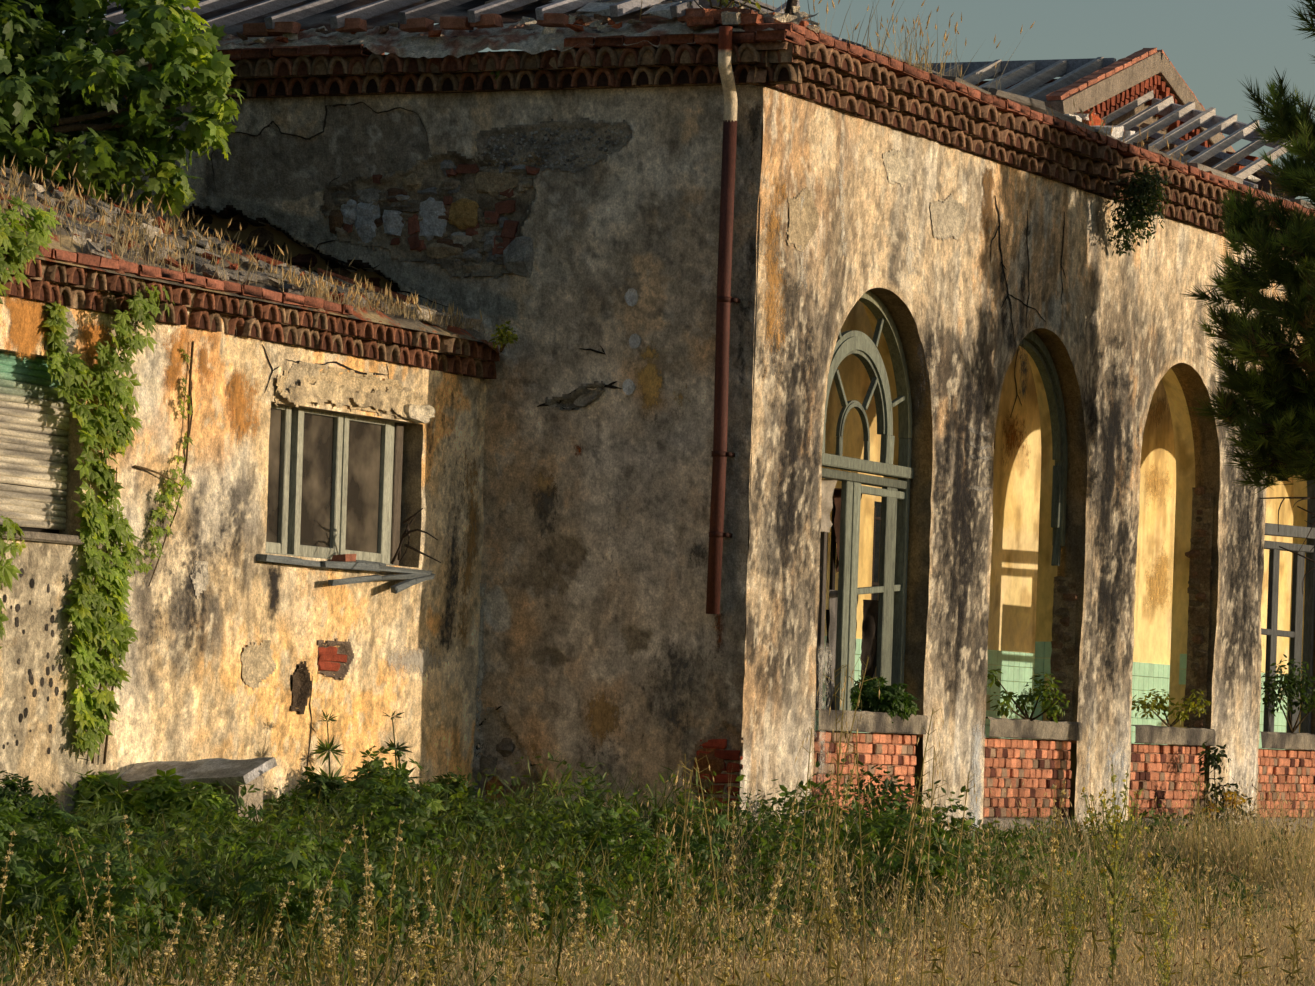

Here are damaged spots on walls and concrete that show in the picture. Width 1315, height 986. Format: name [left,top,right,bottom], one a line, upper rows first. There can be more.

spalling [182,96,632,292]
damp [745,105,761,210]
crack [990,196,1066,417]
damp [737,178,821,640]
damp [151,511,247,651]
flaking render [241,640,276,691]
damp [268,563,281,615]
spalling [291,638,354,714]
damp [917,331,992,704]
damp [1084,331,1170,702]
damp [1225,427,1264,681]
spalling [686,721,743,834]